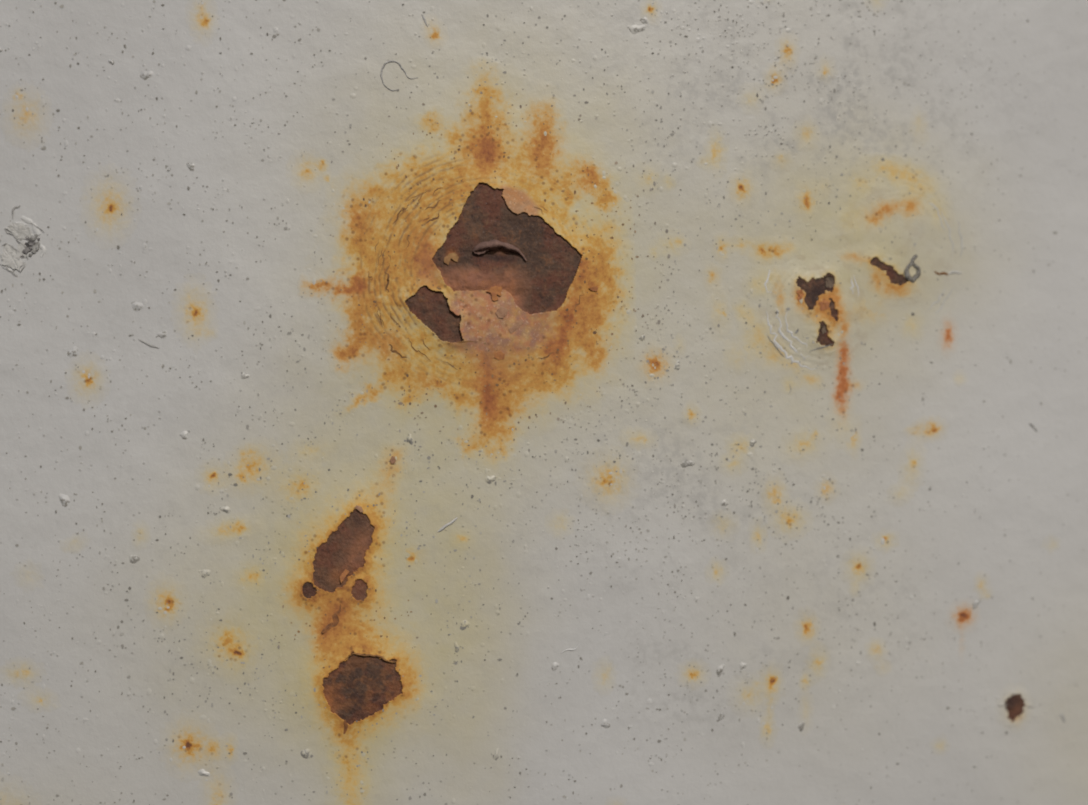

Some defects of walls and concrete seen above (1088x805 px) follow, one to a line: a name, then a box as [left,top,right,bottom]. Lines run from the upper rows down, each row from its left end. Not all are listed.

corrosion [142,56,693,805]